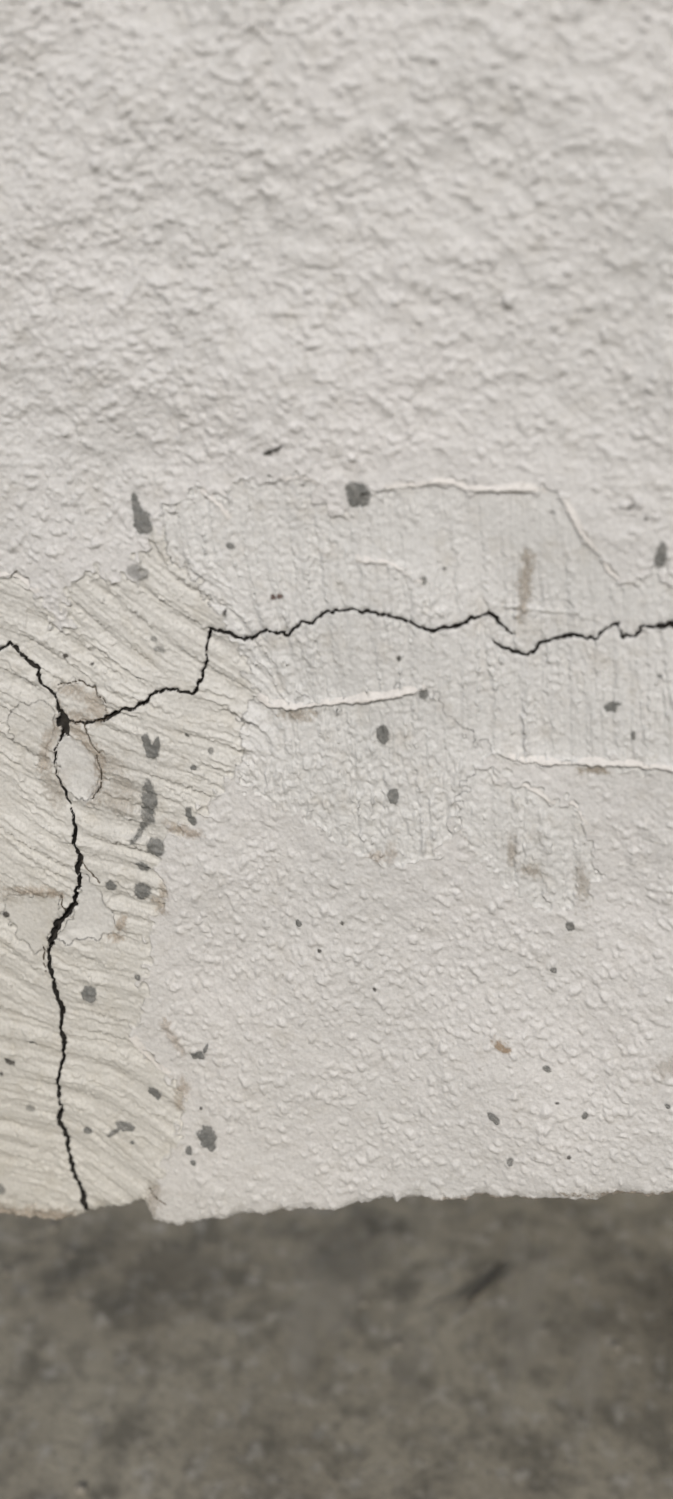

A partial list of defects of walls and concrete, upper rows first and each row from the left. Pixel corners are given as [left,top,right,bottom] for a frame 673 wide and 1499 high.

crack [0,608,673,1210]